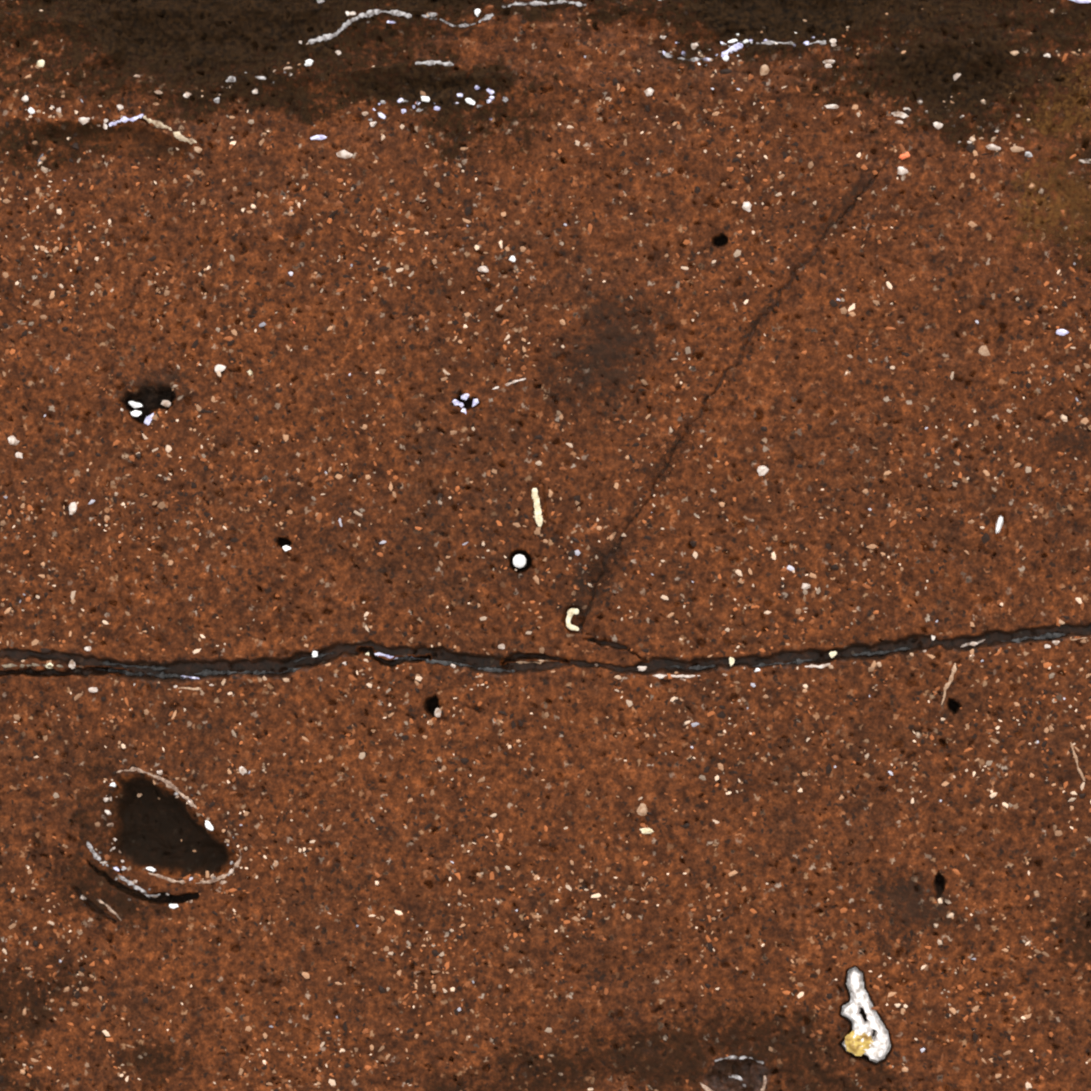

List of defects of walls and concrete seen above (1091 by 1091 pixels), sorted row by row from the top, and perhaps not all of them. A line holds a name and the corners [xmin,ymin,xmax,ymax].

crack [0,158,1091,693]
spalling [75,889,121,923]
spalling [87,767,241,909]